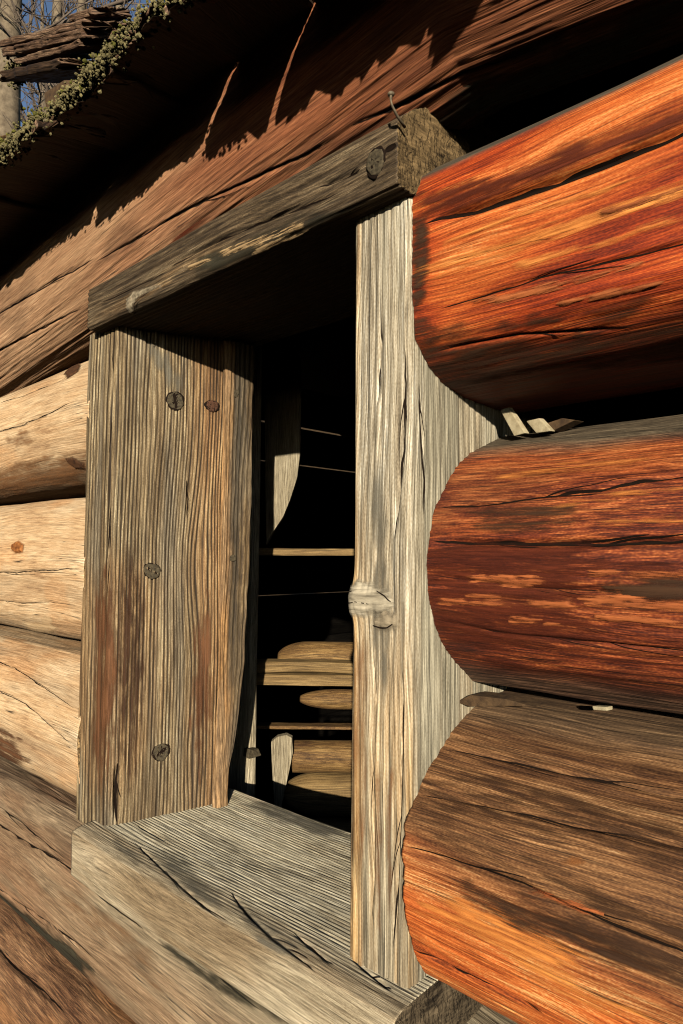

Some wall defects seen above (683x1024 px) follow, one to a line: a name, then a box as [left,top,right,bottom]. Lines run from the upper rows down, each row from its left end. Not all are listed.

crack [0,18,595,314]
crack [425,133,683,224]
crack [376,332,683,538]
crack [433,534,683,548]
crack [370,647,378,813]
crack [372,673,683,952]
crack [135,828,390,989]